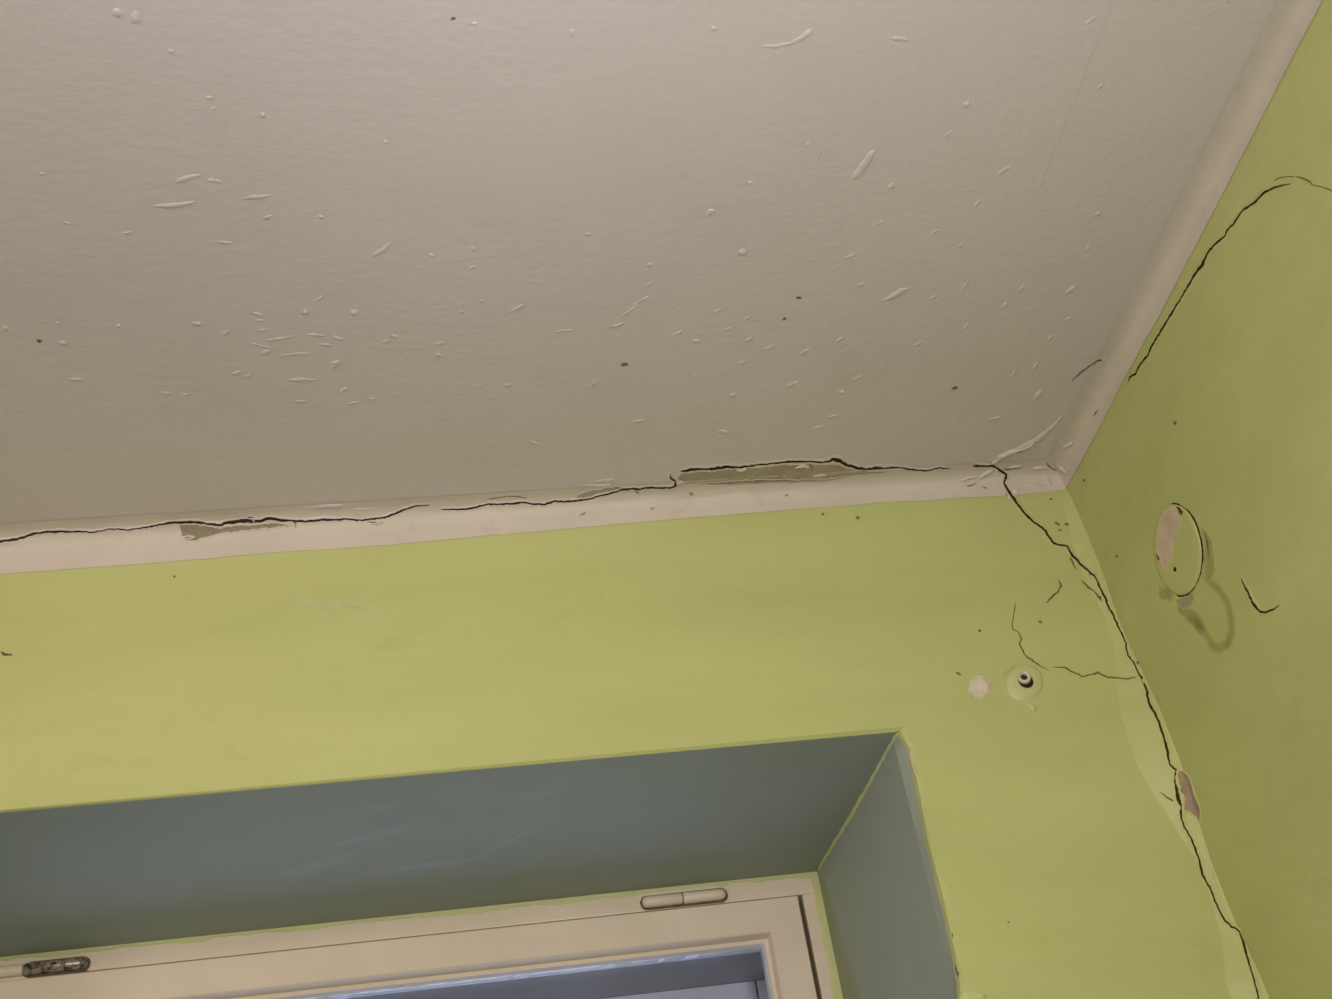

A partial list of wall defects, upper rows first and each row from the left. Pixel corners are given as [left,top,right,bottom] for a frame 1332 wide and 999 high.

crack [1072,176,1332,384]
peeling [1156,506,1183,572]
crack [0,454,1262,999]